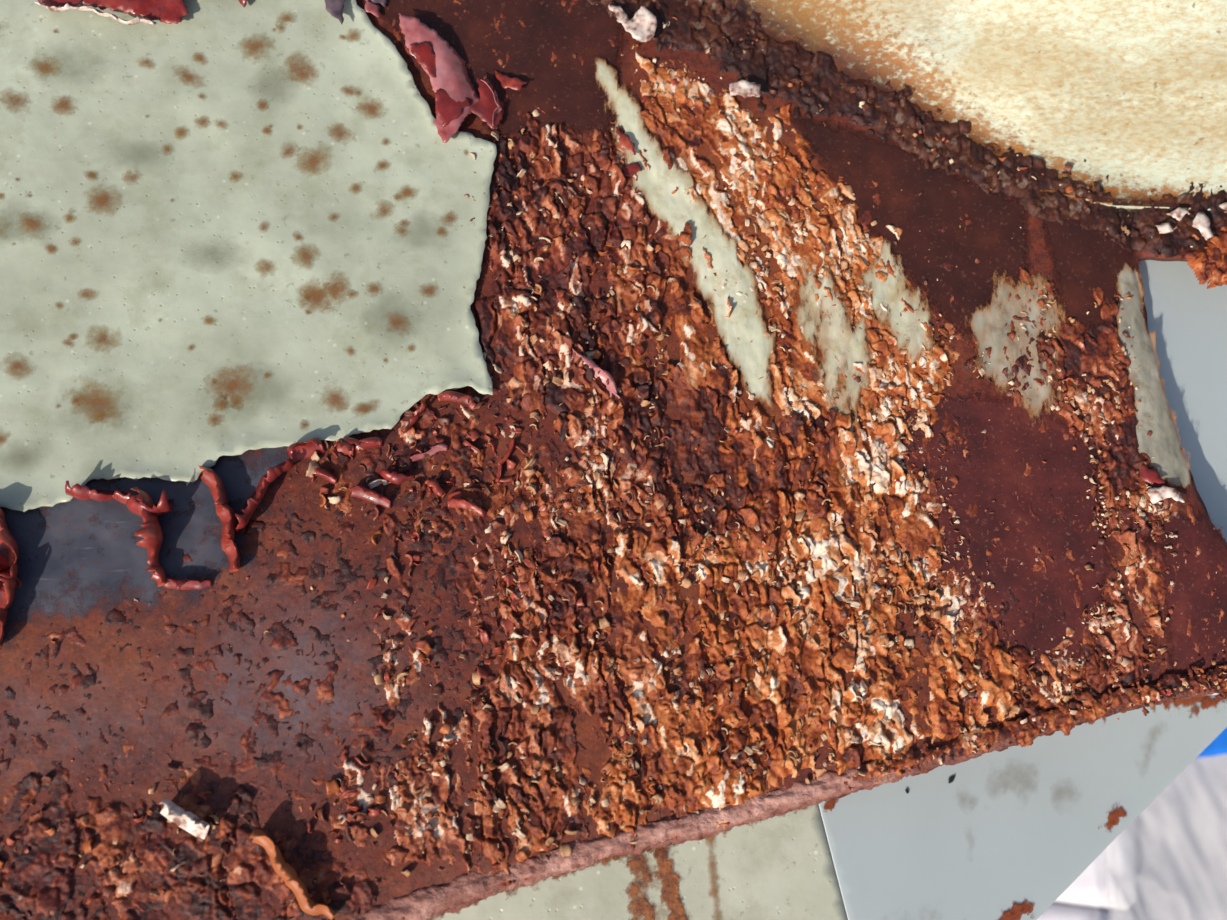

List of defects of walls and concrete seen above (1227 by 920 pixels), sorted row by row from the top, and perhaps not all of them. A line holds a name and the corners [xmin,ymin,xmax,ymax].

rust [701,0,1212,209]
peeling [0,0,528,644]
peeling [595,58,776,409]
peeling [786,241,933,426]
peeling [962,273,1066,423]
peeling [1116,263,1190,504]
peeling [1155,207,1213,240]
rust [1180,226,1227,289]
rust [0,623,111,773]
rust [153,591,270,749]
rust [0,743,386,920]
rust [590,836,687,920]